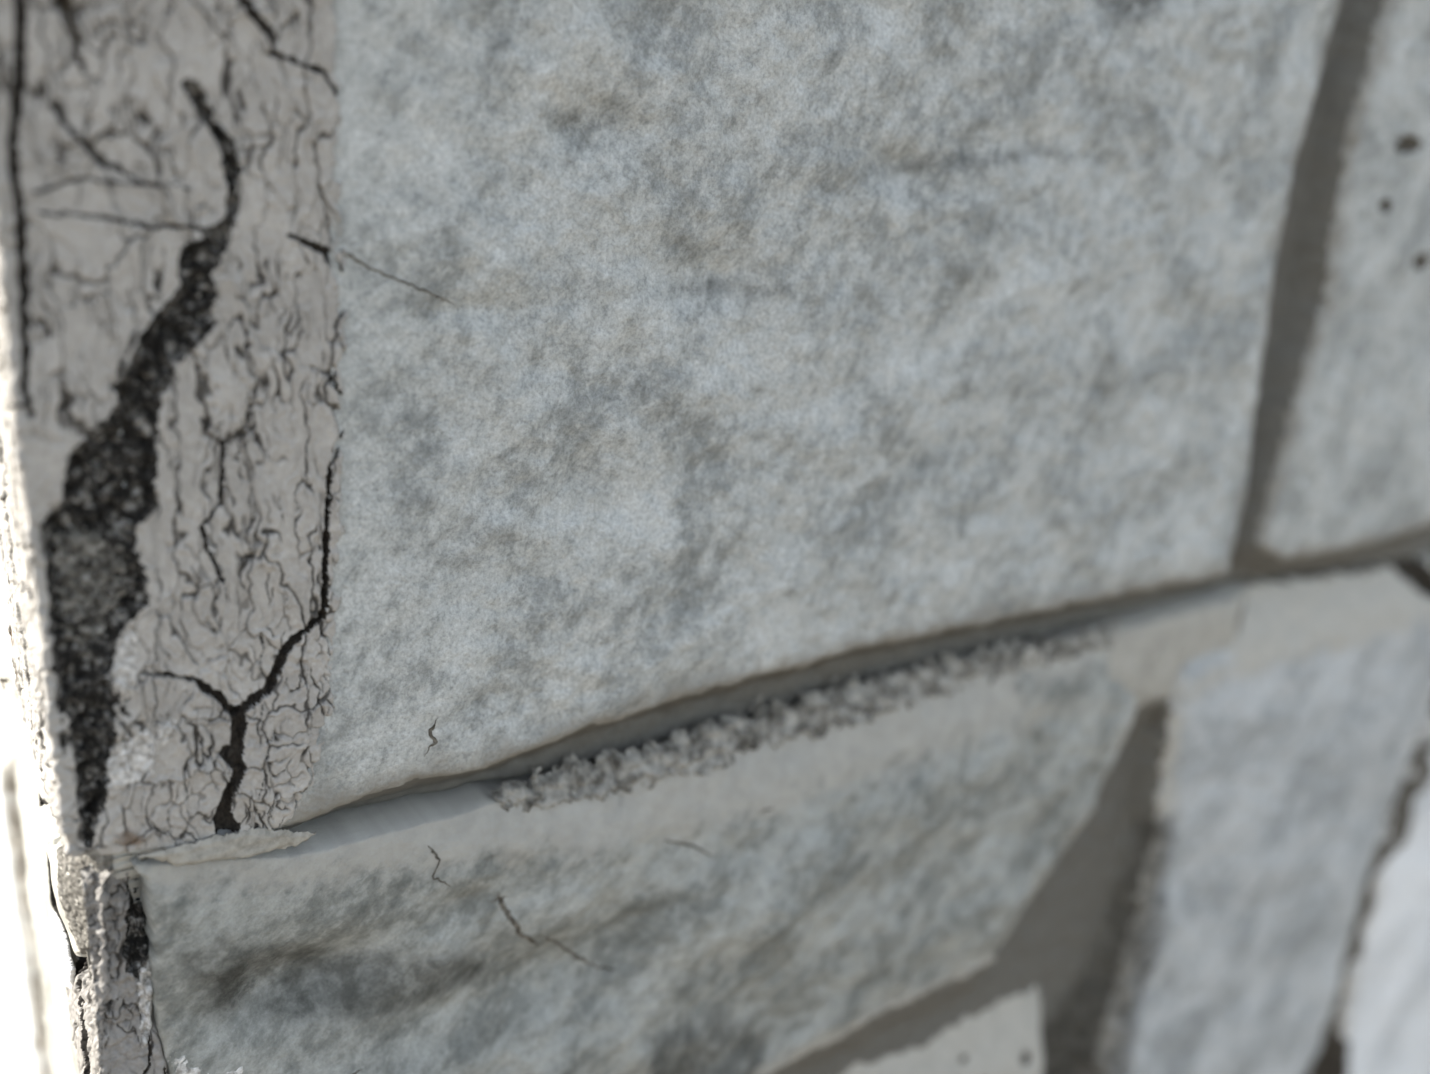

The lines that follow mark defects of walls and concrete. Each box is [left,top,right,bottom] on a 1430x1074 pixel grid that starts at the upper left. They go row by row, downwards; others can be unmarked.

crack [287,233,455,306]
crack [0,0,343,849]
crack [424,720,438,757]
peeling [50,911,76,989]
crack [121,876,149,979]
crack [38,958,91,1074]
crack [140,1013,166,1074]